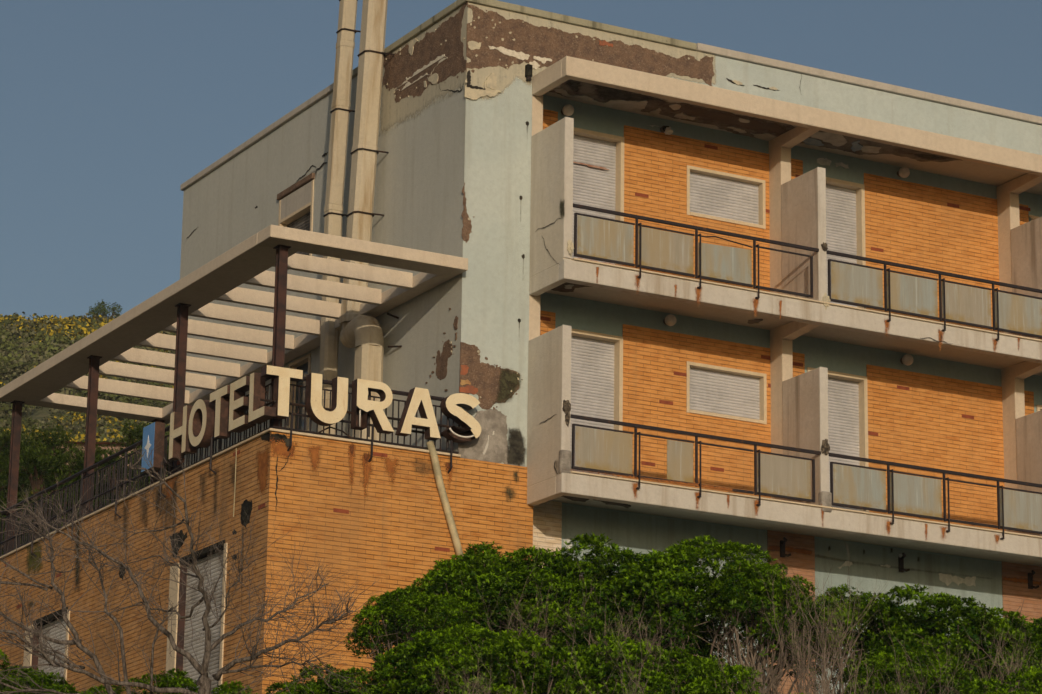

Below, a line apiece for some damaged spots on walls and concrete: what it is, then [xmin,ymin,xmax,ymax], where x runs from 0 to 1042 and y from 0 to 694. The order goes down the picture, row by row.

spalling [380,2,716,132]
peeling [549,79,794,141]
peeling [800,131,963,169]
peeling [461,182,474,243]
rust [579,258,702,303]
spalling [425,308,523,464]